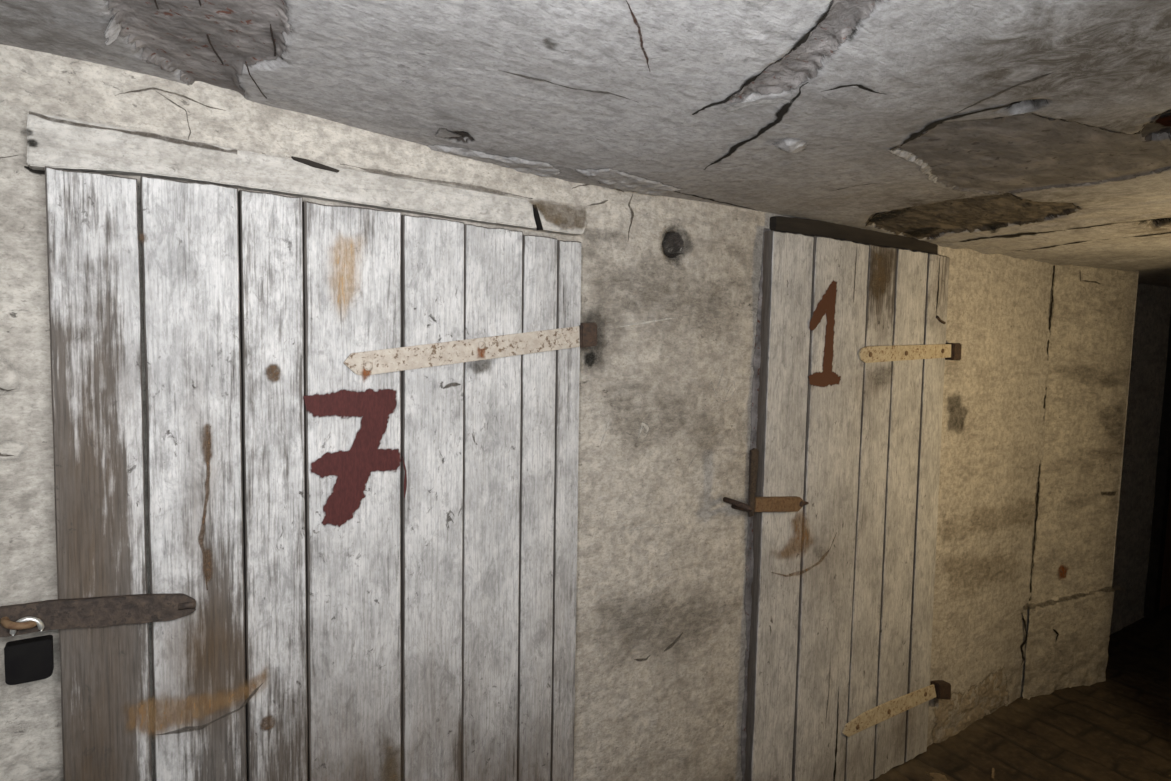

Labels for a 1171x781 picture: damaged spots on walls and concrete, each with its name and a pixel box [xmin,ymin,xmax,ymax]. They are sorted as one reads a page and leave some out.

flaking render [104,0,292,99]
crack [498,70,634,101]
crack [692,0,833,115]
crack [675,82,883,211]
flaking render [725,0,880,111]
crack [901,71,1057,146]
flaking render [866,109,1171,240]
damp [949,397,967,429]
crack [1020,460,1121,665]